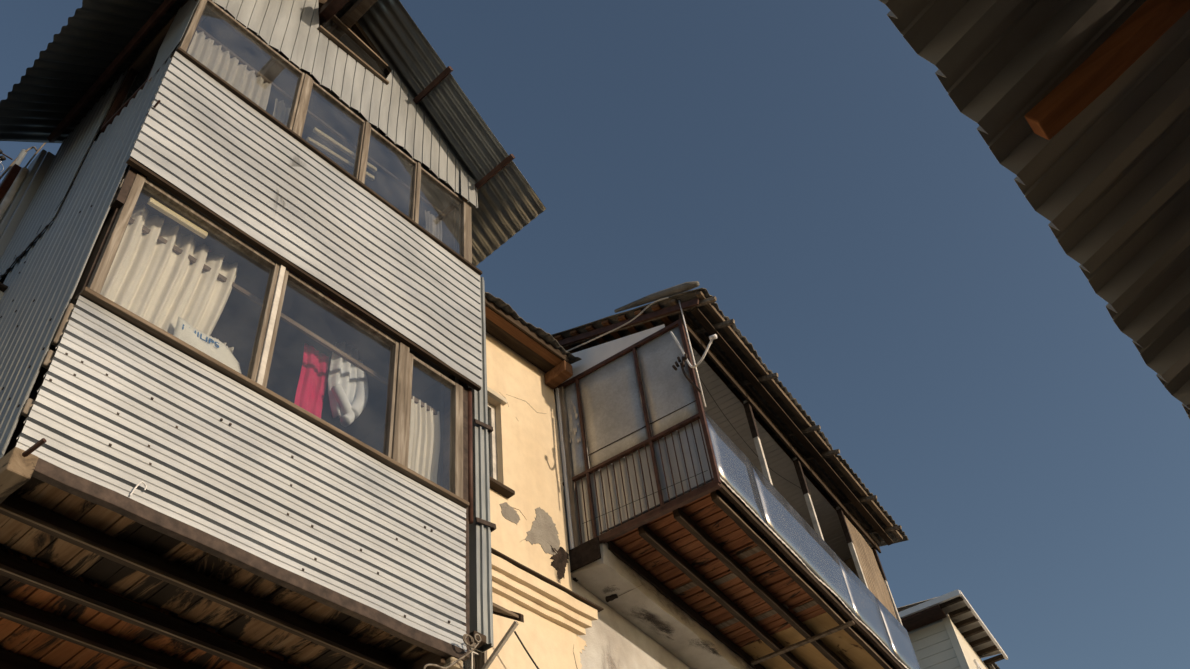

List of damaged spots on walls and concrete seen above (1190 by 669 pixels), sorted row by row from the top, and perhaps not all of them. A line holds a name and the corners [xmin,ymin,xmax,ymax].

flaking render [499,502,578,582]